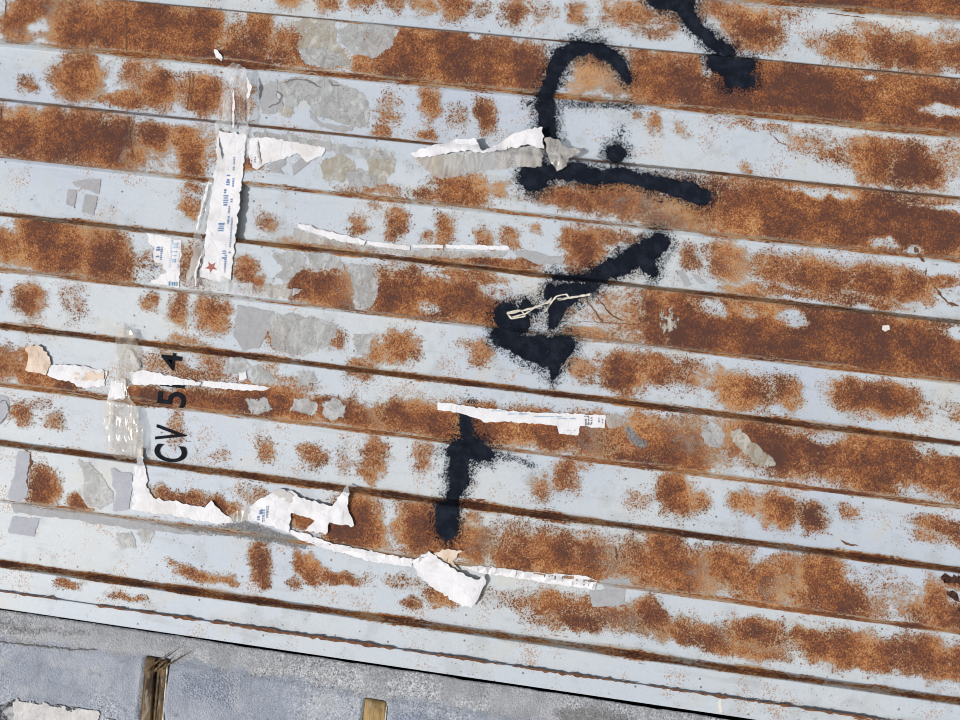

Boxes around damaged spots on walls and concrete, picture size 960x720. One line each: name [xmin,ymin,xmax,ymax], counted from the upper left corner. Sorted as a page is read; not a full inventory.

rust [0,0,686,225]
rust [232,253,273,296]
rust [0,338,108,432]
rust [442,395,554,413]
rust [0,440,137,463]
rust [22,458,259,535]
rust [290,513,314,533]
rust [896,512,960,550]
rust [244,534,277,593]
rust [281,539,459,612]
rust [96,590,201,621]
rust [210,621,903,720]